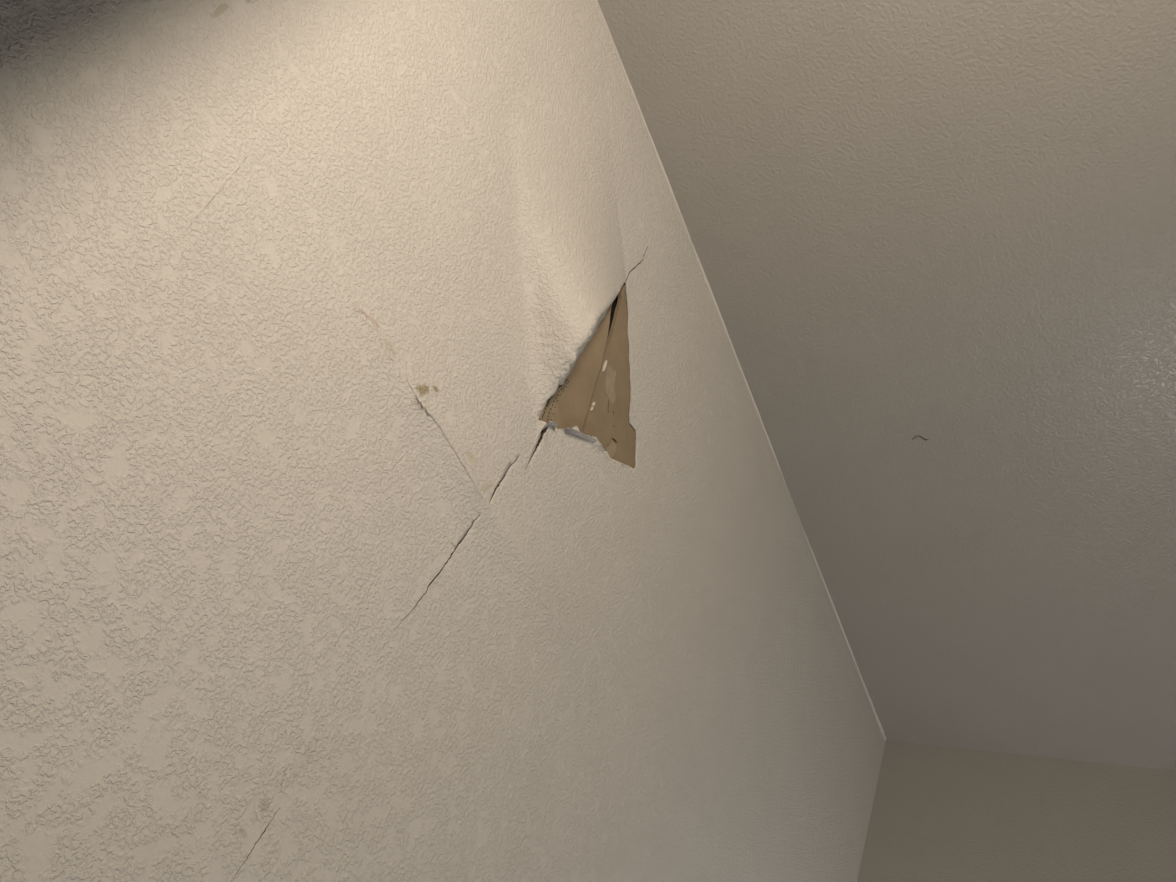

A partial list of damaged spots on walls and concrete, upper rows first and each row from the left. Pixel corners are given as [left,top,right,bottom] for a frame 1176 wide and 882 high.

crack [394,428,548,630]